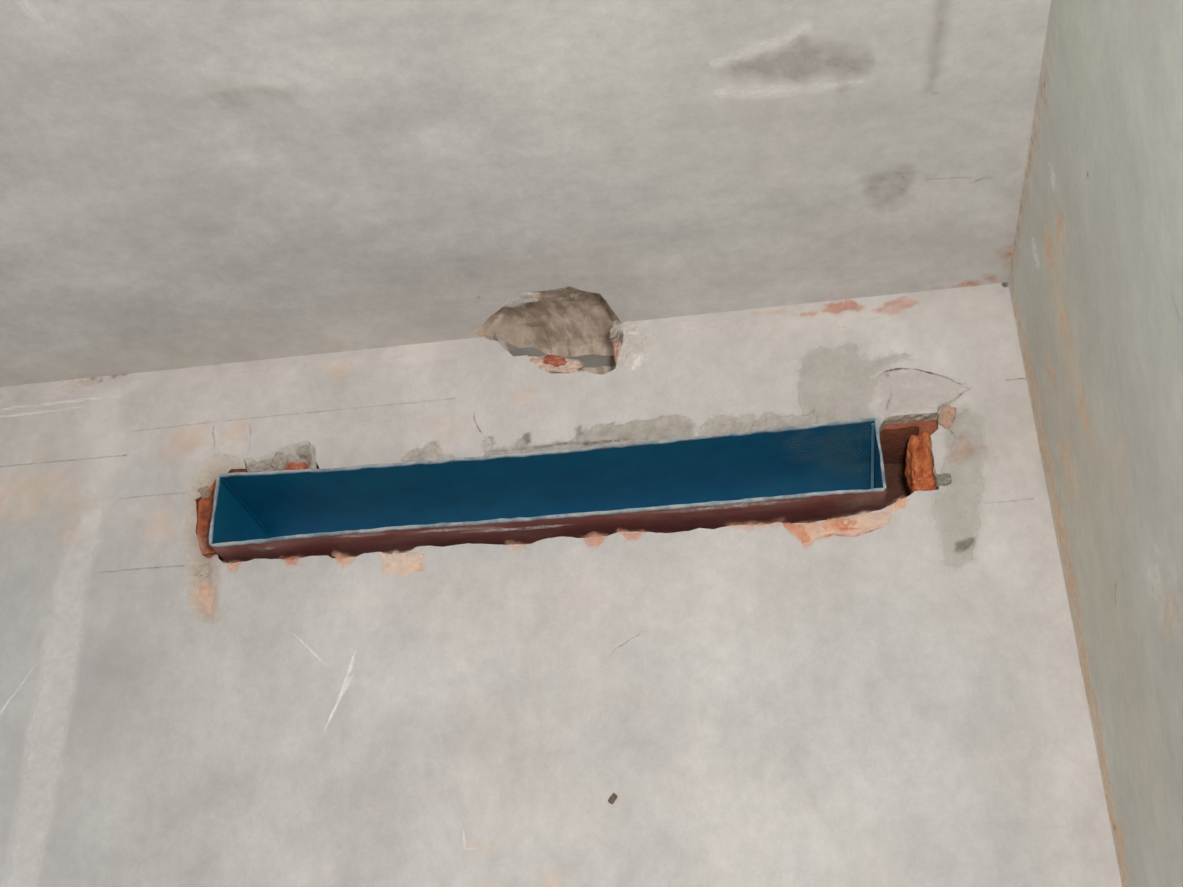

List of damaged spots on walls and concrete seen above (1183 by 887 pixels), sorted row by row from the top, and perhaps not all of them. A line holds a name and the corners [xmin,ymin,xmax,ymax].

spalling [784,413,939,546]